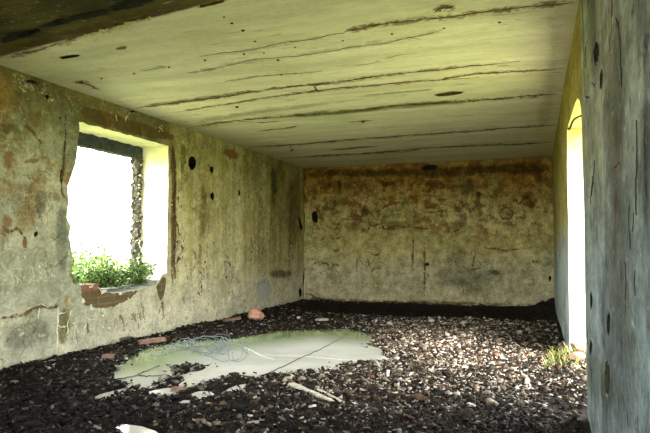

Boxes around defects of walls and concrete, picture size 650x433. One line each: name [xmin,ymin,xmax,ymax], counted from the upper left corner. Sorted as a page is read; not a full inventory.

crack [38,115,71,199]
crack [115,1,596,232]
peeling [156,174,266,308]
crack [2,301,164,348]
flaking render [80,283,147,336]